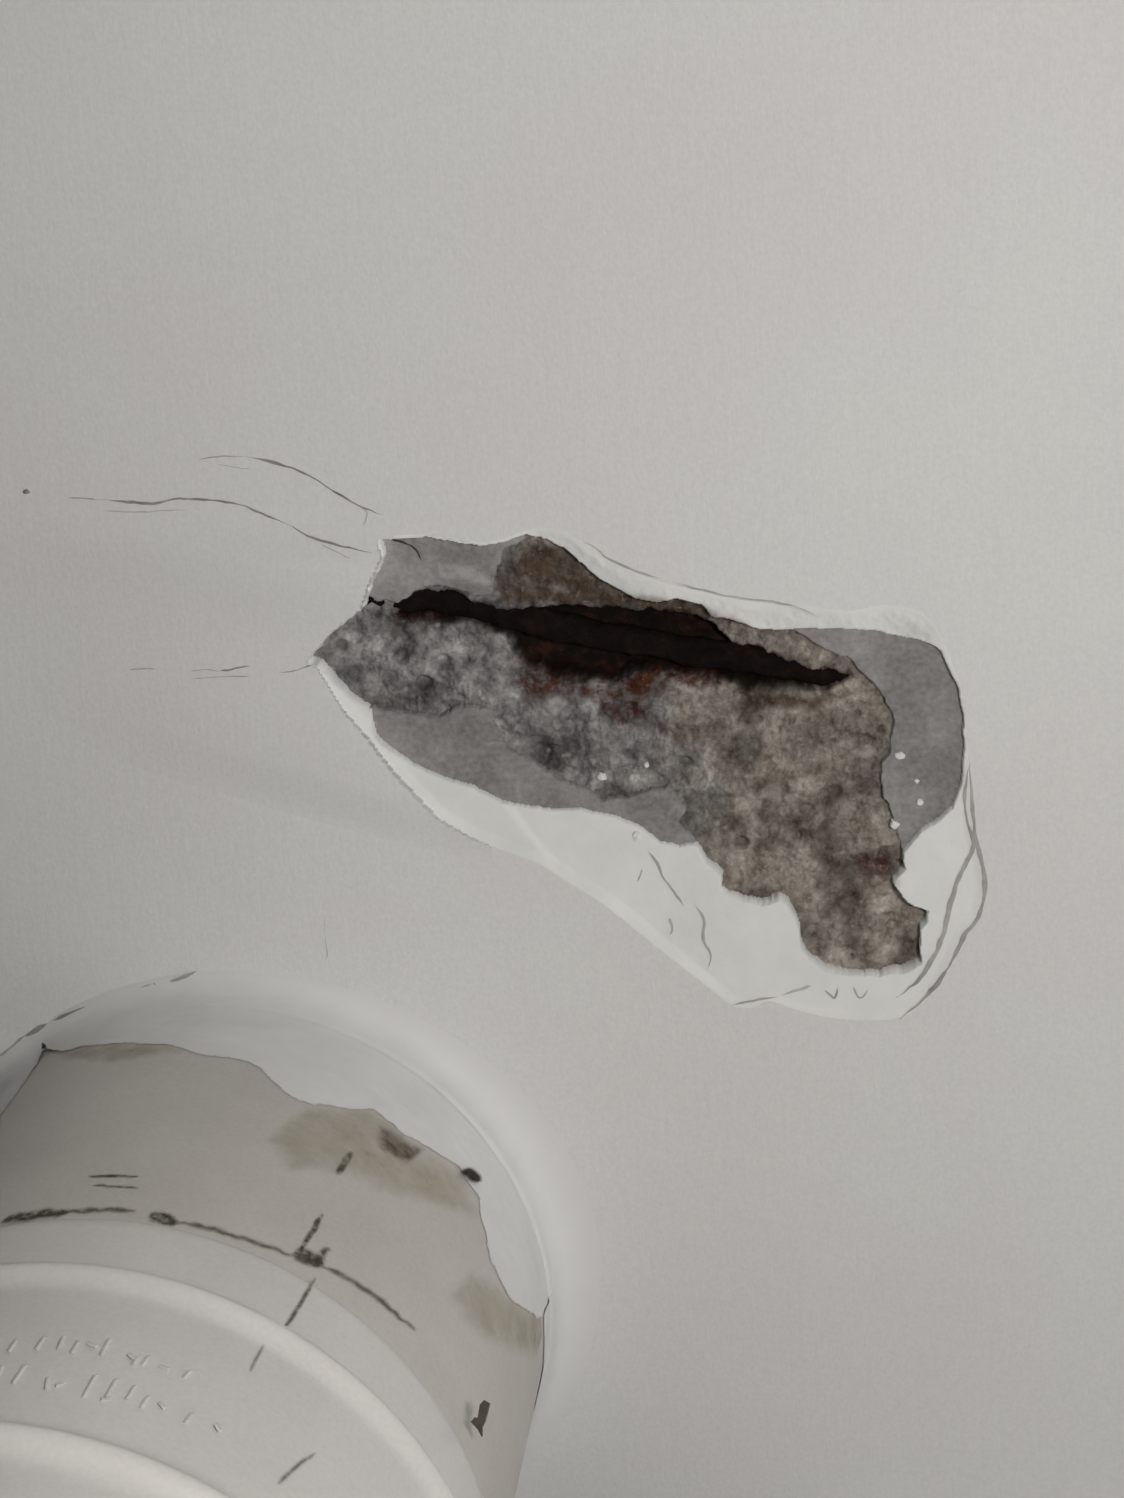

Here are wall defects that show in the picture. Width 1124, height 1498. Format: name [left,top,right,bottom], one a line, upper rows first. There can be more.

crack [70,455,421,560]
corrosion [499,545,714,618]
corrosion [520,667,707,723]
spalling [307,528,983,1021]